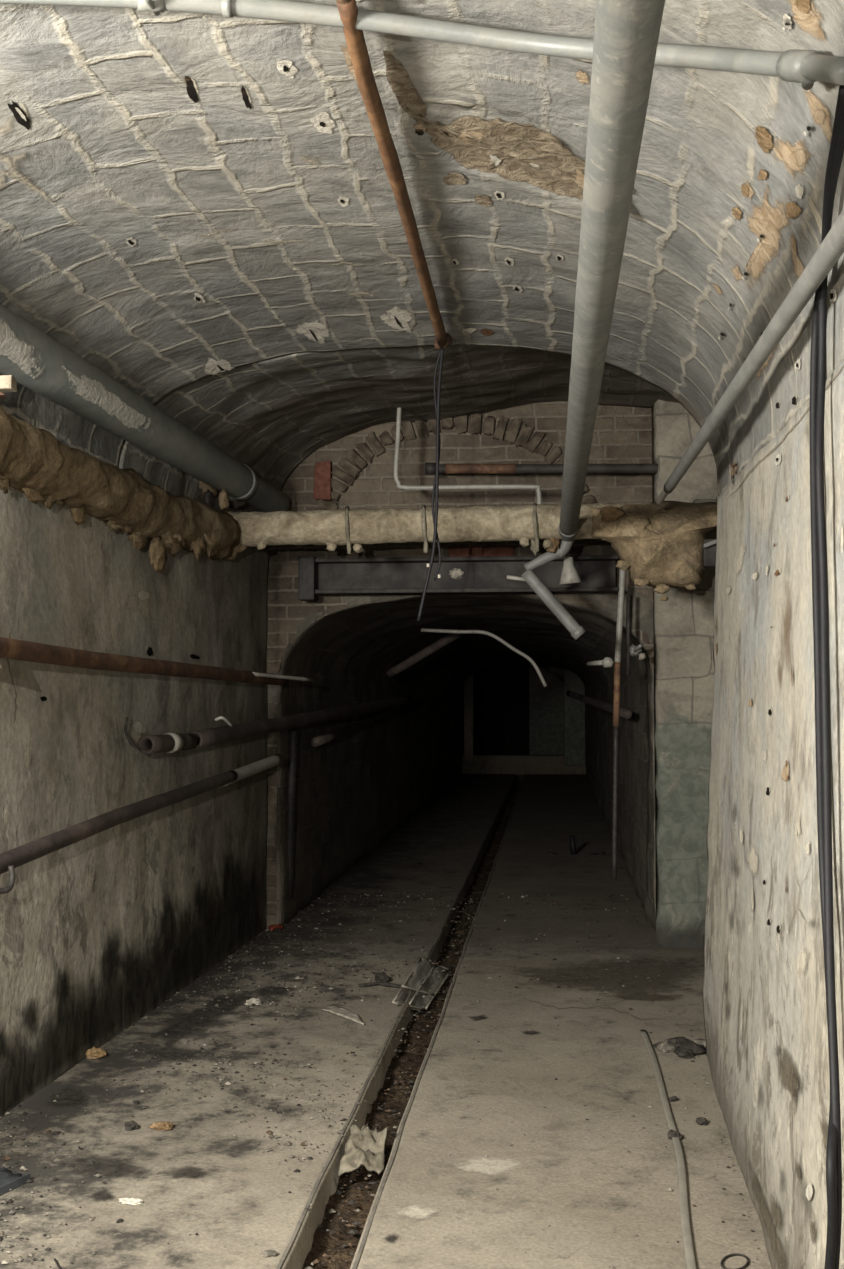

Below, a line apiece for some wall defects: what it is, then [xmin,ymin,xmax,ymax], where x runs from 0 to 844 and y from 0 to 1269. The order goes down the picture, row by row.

peeling [782,0,825,40]
spalling [382,49,585,207]
peeling [731,91,832,285]
water stain [0,854,267,1117]
water stain [152,987,290,1060]
water stain [60,1155,139,1176]
water stain [91,1190,113,1200]
water stain [172,1167,203,1177]